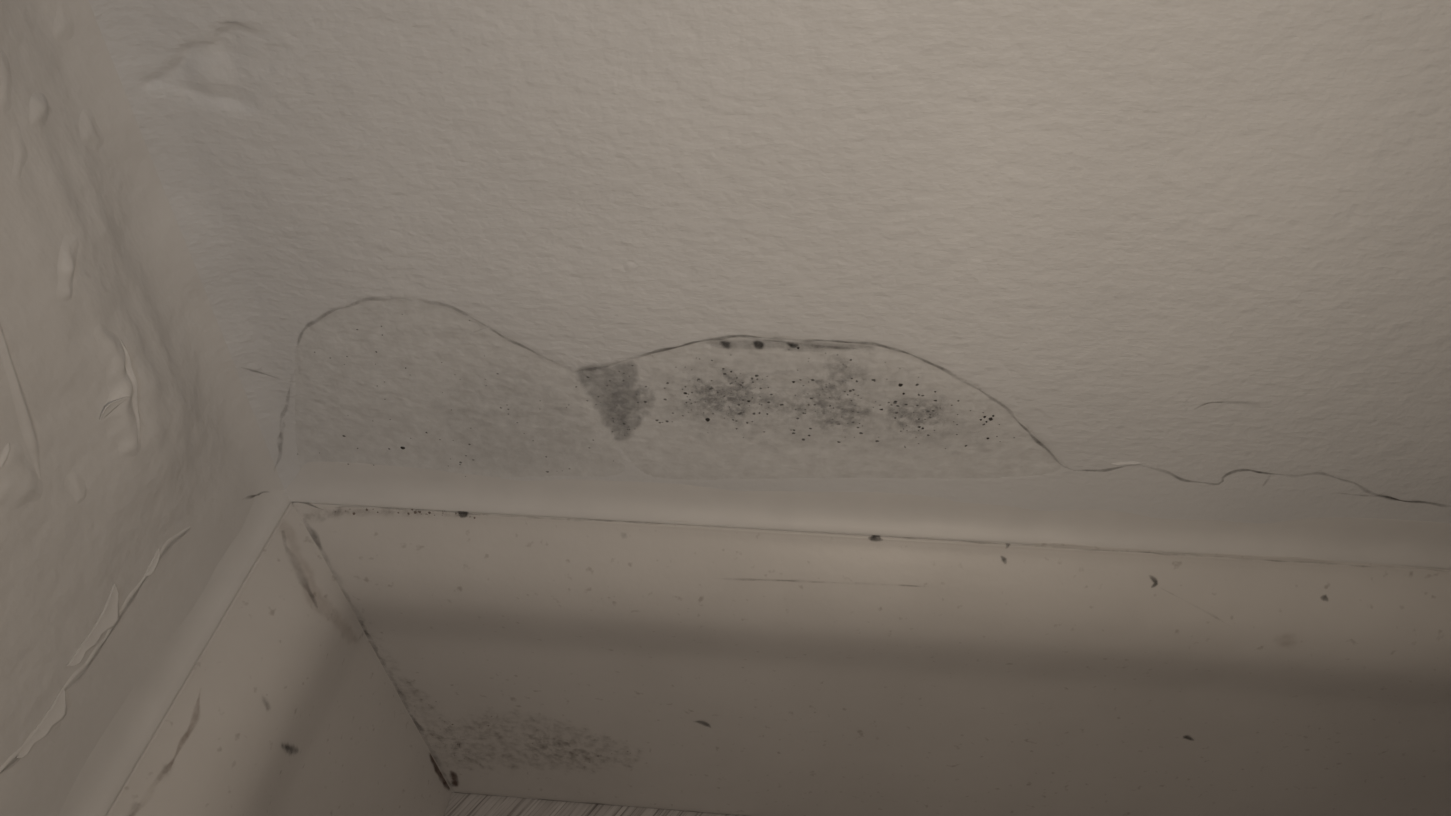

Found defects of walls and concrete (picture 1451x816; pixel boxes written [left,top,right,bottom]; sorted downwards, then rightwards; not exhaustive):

leakage [430,755,450,789]